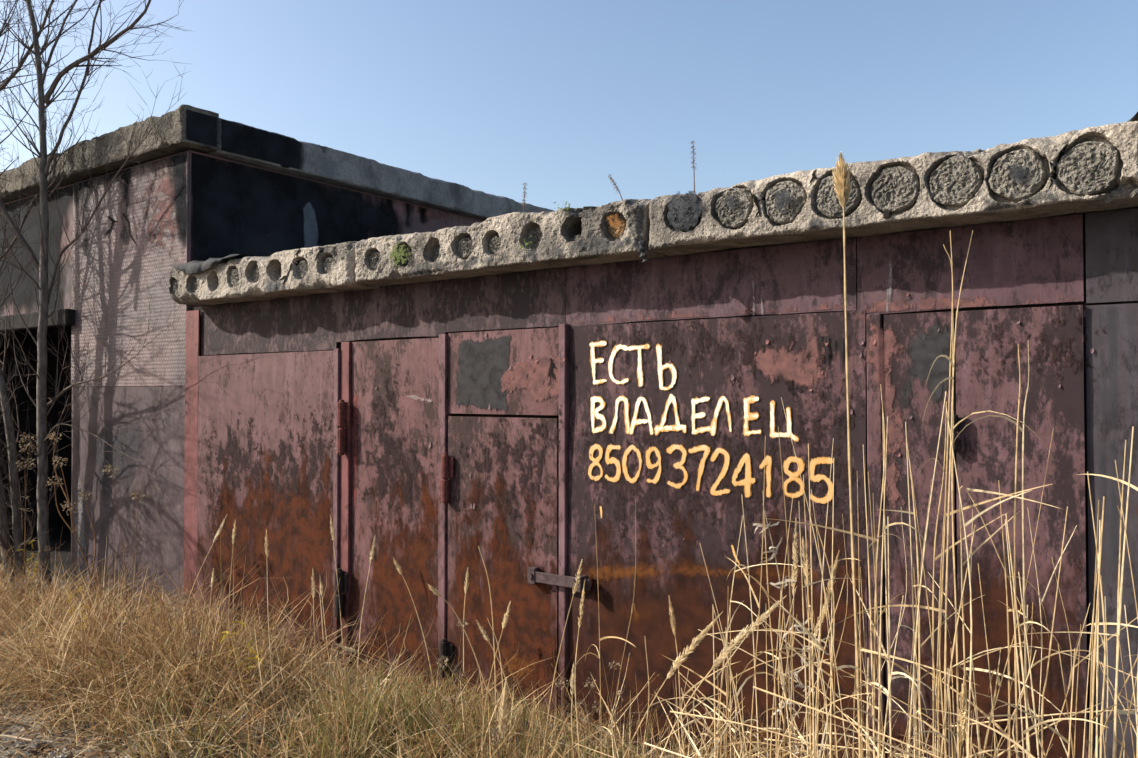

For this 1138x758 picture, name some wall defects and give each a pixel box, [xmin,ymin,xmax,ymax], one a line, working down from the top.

leakage [121,169,130,243]
peeling [452,289,1106,575]
rust [198,433,438,683]
rust [453,477,557,718]
rust [572,513,865,758]